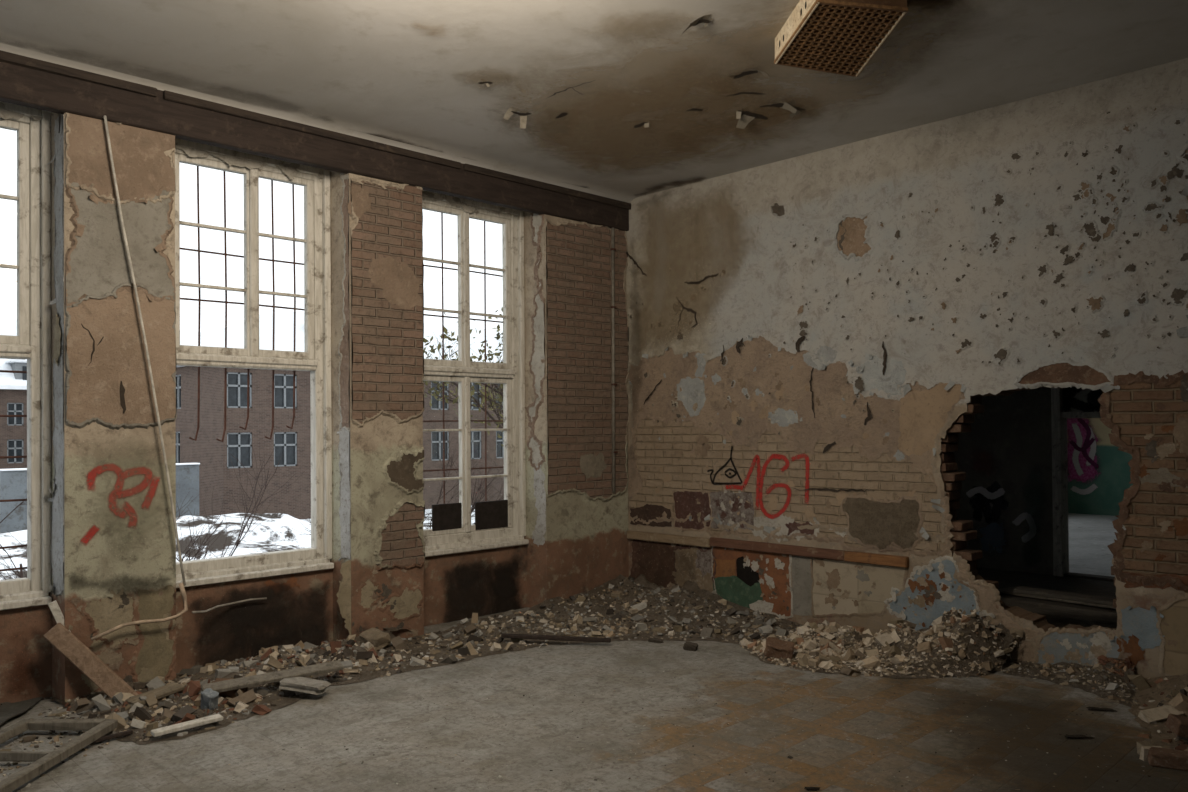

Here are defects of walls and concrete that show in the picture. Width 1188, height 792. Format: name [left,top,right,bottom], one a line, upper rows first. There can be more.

spalling [0,102,300,683]
crack [676,273,719,327]
water stain [522,0,953,170]
spalling [336,105,1188,665]